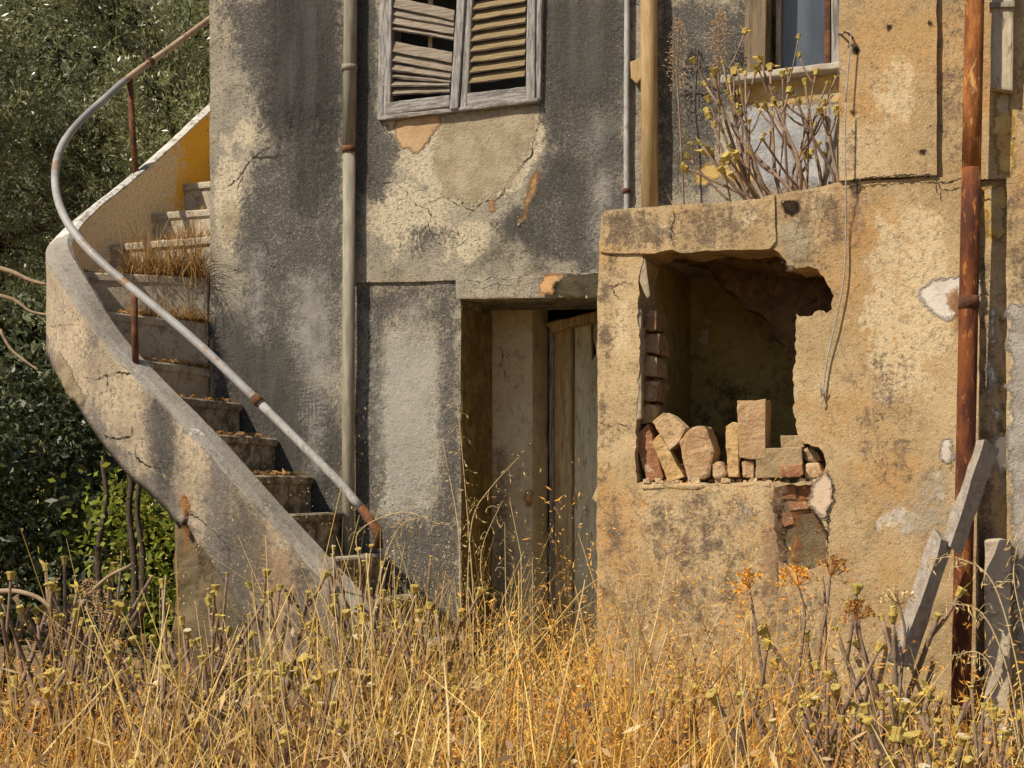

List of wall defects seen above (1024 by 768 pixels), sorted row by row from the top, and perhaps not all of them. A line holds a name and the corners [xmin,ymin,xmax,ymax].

crack [227,146,299,194]
leakage [264,0,344,219]
crack [373,114,550,248]
flaking render [393,106,537,211]
flaking render [517,169,540,226]
spalling [538,272,599,299]
crack [104,427,174,474]
flaking render [774,470,834,569]
flaking render [985,302,1024,656]